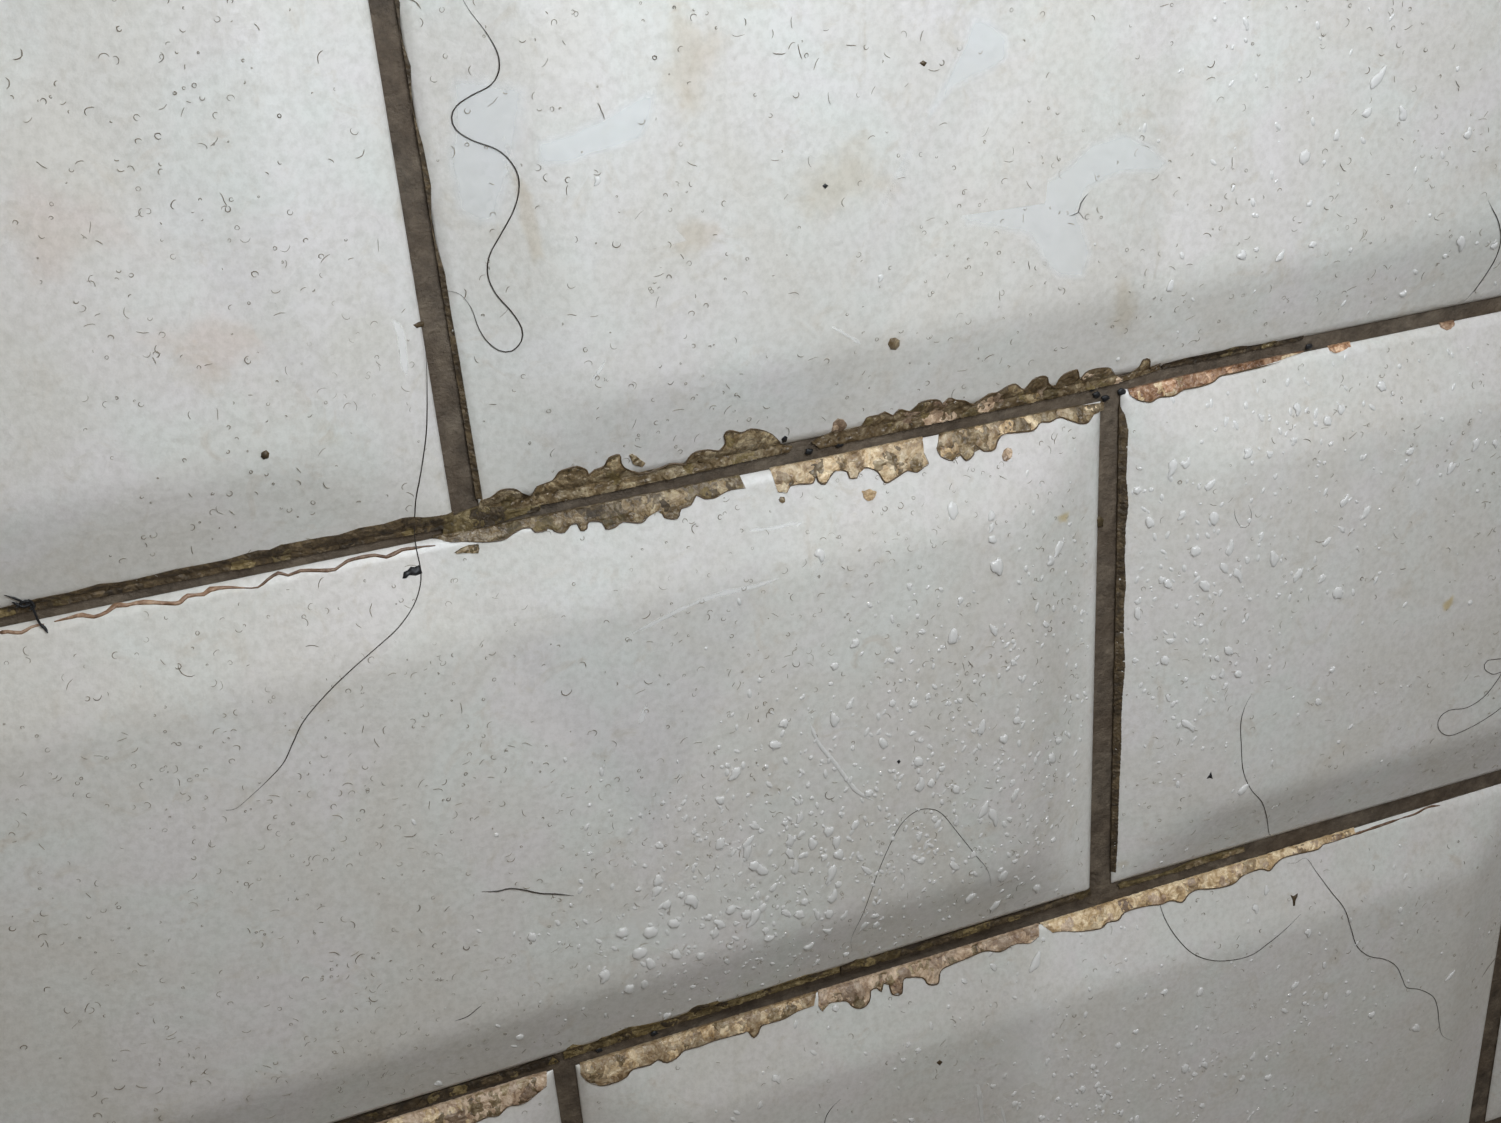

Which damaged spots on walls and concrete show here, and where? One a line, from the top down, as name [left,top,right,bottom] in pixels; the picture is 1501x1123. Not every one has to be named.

peeling [1327,341,1351,353]
spalling [432,351,1304,554]
crack [0,545,435,634]
spalling [580,827,1355,1086]
spalling [377,1071,547,1123]